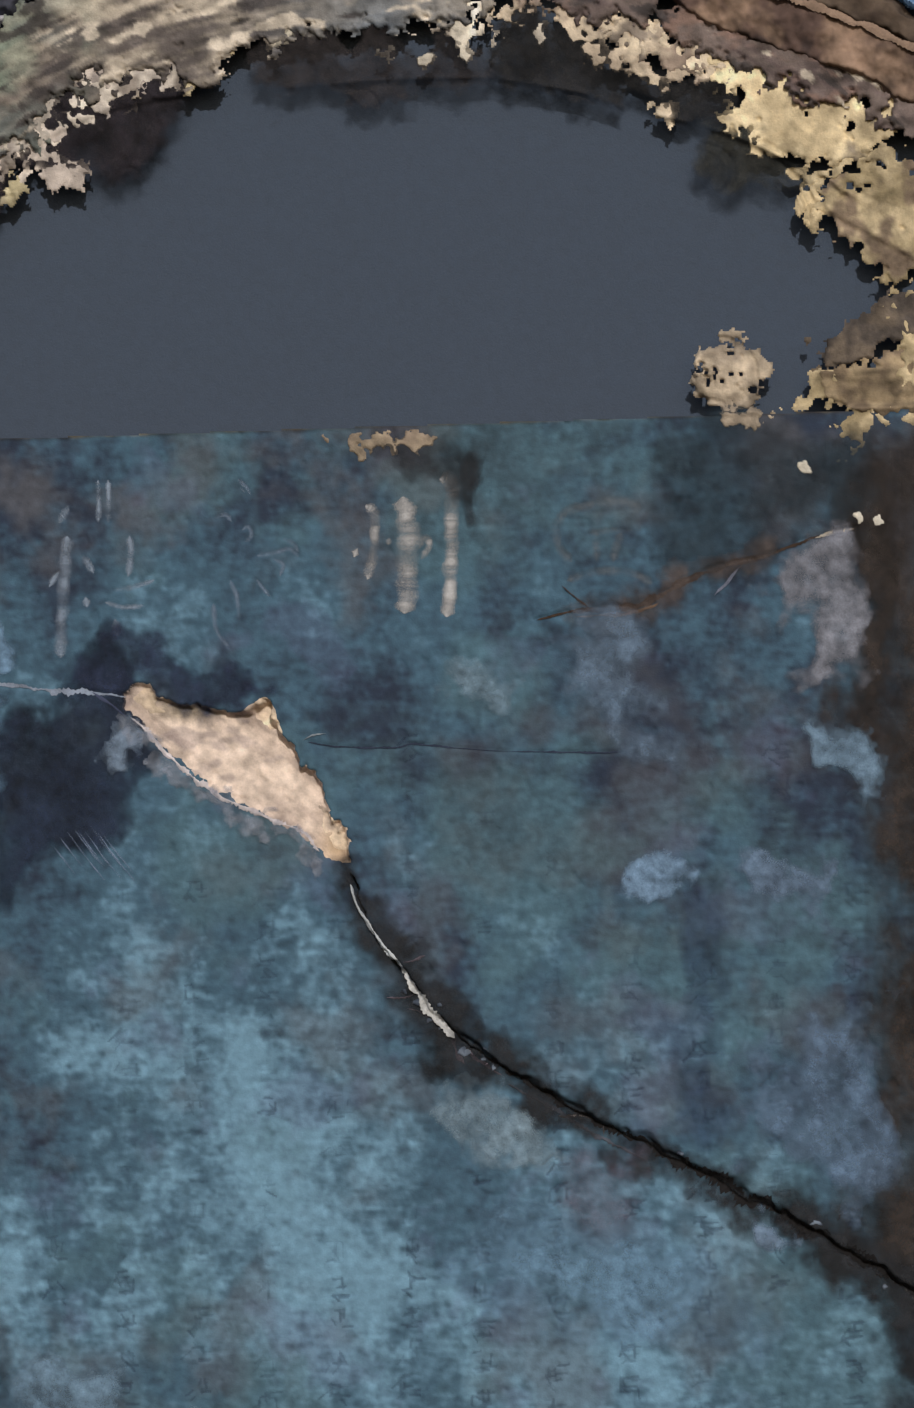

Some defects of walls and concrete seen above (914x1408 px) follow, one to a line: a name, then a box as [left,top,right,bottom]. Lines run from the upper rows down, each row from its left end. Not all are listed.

flaking render [0,62,196,207]
flaking render [418,53,433,66]
flaking render [427,0,914,388]
flaking render [688,327,914,451]
crack [0,682,135,723]
leakage [0,624,275,905]
spalling [124,683,351,868]
crack [304,733,619,754]
crack [538,529,854,620]
leakage [664,403,914,901]
crack [350,873,914,1301]
leakage [753,921,914,1267]